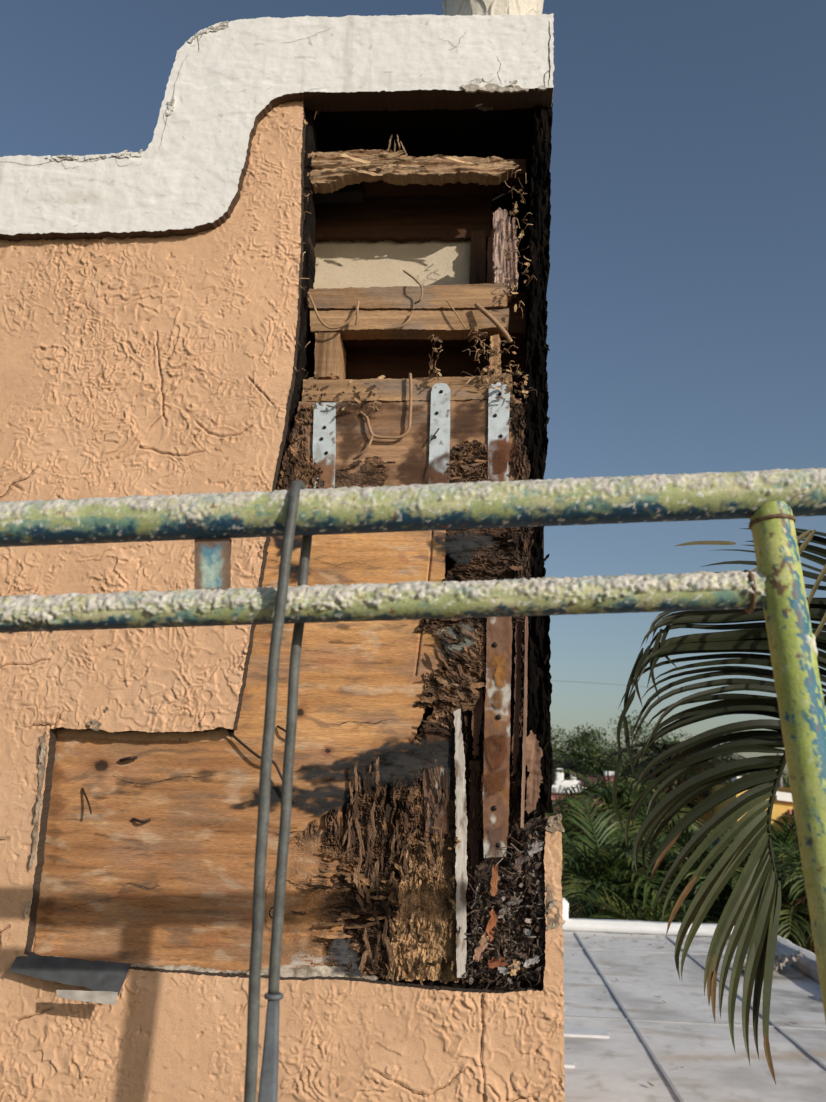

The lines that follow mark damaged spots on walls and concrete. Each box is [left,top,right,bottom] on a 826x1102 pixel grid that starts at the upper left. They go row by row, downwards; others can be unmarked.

spalling [307,347,315,379]
spalling [344,318,528,400]
peeling [460,459,487,472]
rust [488,437,514,482]
peeling [421,676,443,703]
peeling [443,618,485,702]
rust [491,656,506,710]
peeling [428,711,463,734]
rust [484,735,507,795]
flaking render [29,732,48,870]
spalling [454,808,565,991]